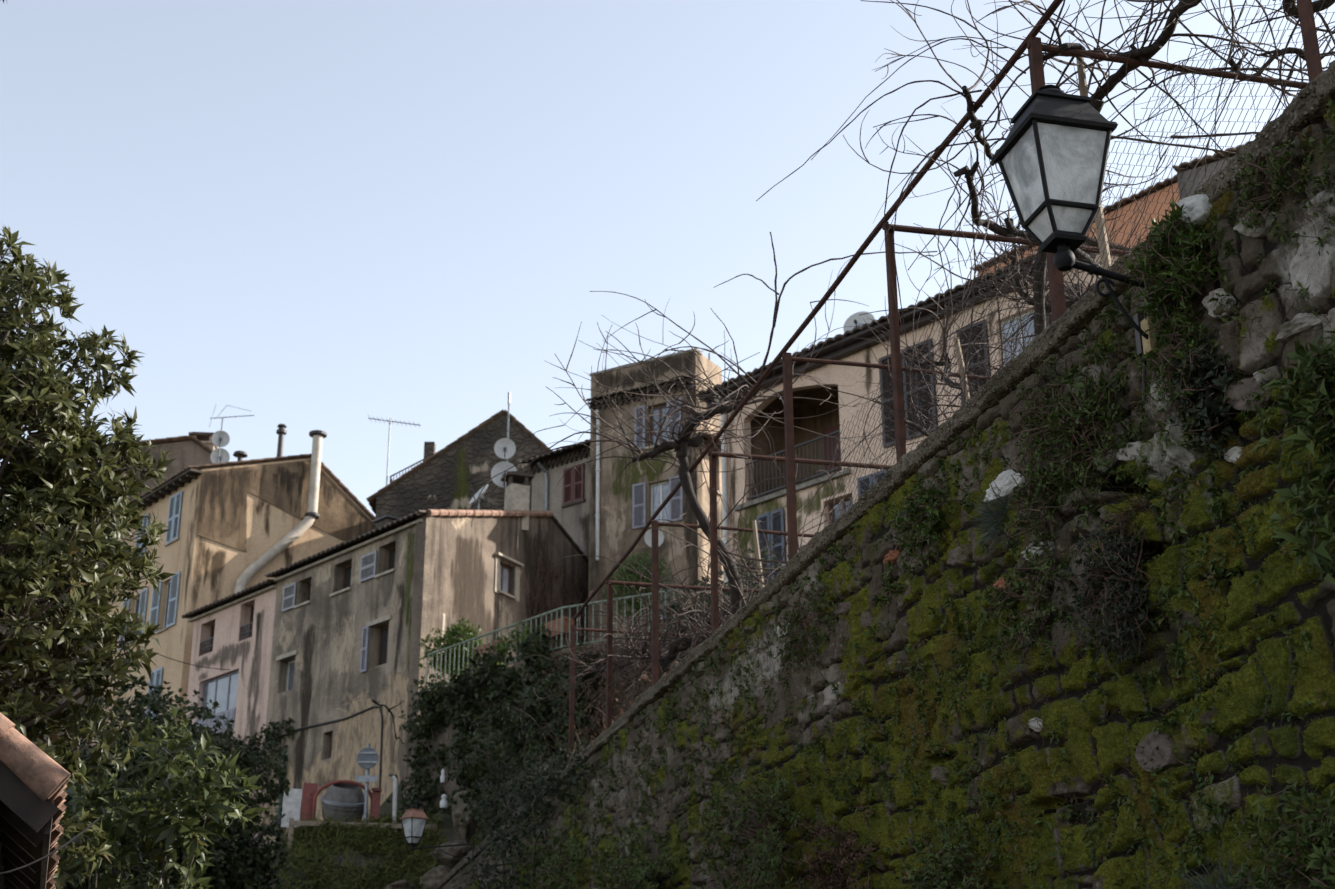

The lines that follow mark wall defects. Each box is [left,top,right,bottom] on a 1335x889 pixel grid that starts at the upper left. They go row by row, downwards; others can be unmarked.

damp [185,485,226,606]
damp [442,536,495,644]
damp [517,521,550,641]